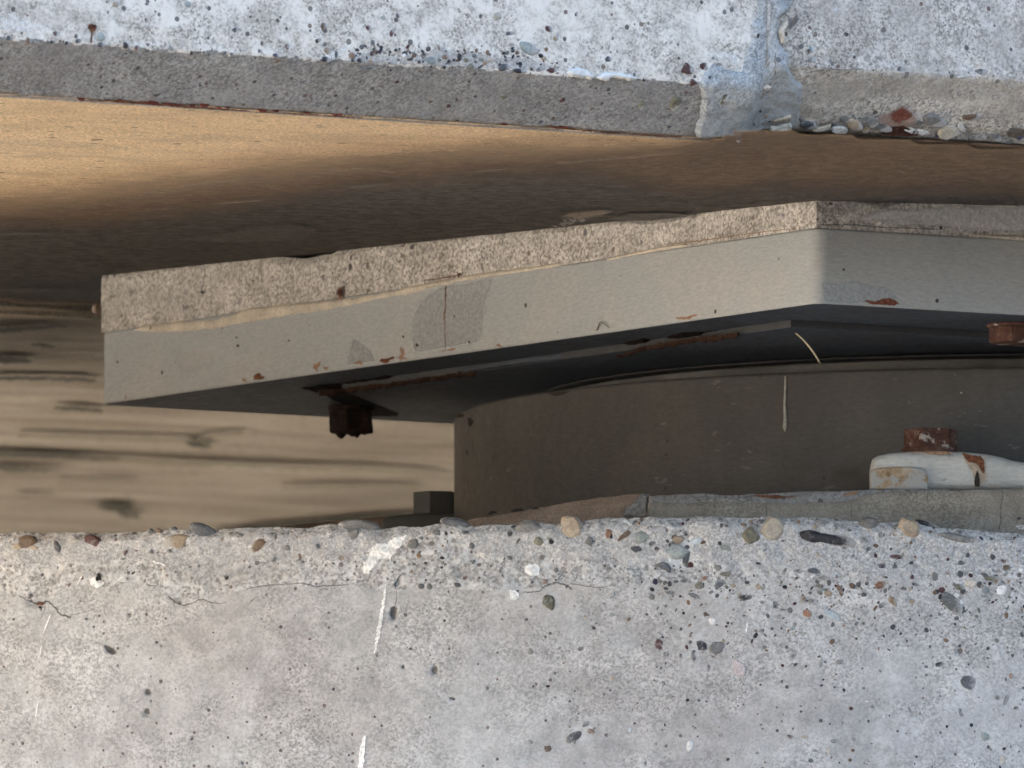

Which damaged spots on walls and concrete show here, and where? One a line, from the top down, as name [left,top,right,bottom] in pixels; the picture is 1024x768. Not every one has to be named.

corrosion [865,298,899,306]
corrosion [963,453,986,482]
crack [148,582,348,606]
crack [19,595,95,619]